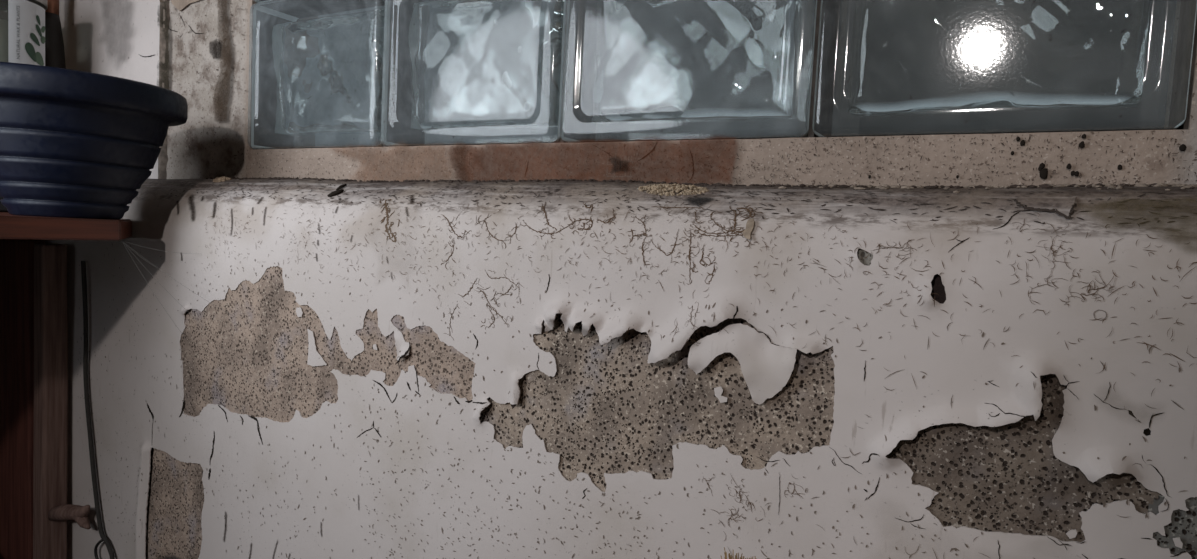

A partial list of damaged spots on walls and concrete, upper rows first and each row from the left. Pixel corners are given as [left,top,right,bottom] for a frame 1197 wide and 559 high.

peeling [147,448,204,559]
peeling [180,266,476,422]
peeling [480,313,835,492]
peeling [886,374,1197,559]